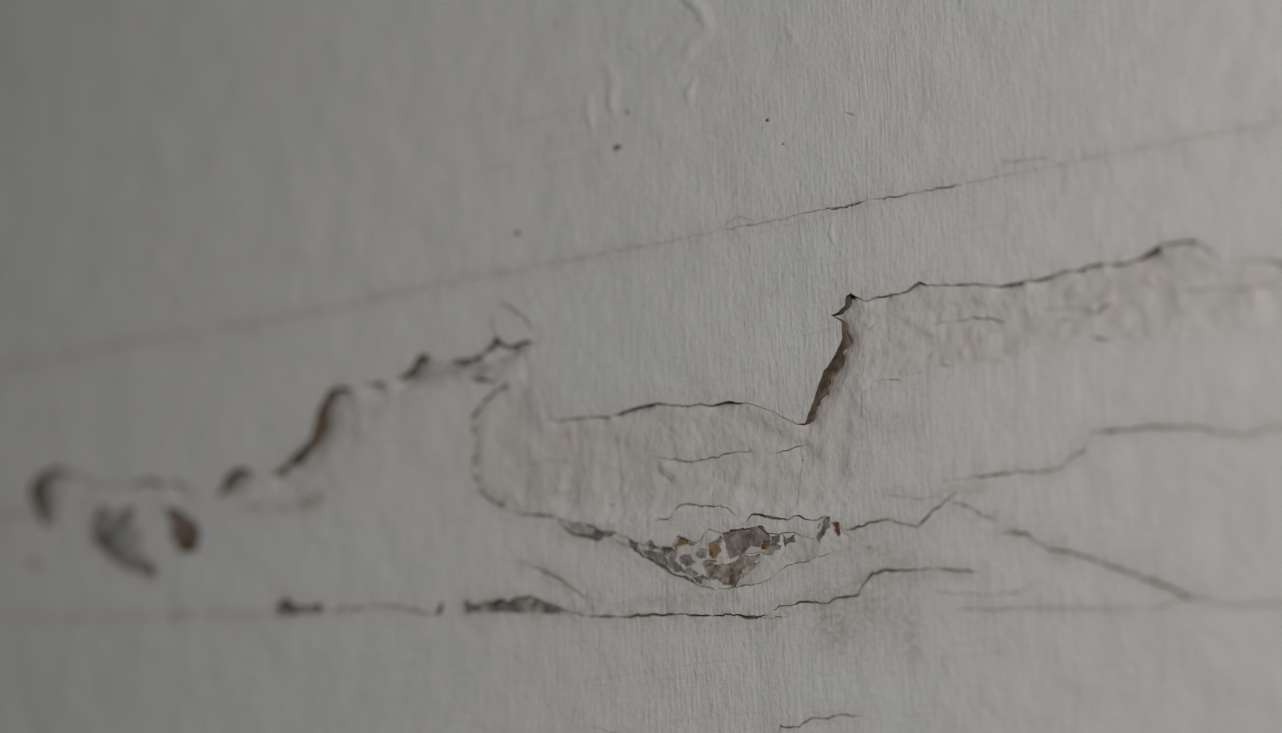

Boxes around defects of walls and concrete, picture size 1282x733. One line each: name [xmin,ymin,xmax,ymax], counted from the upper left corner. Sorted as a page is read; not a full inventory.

crack [0,119,1282,367]
peeling [29,240,1282,589]
spalling [273,599,323,616]
spalling [464,596,569,615]
crack [525,425,1282,619]